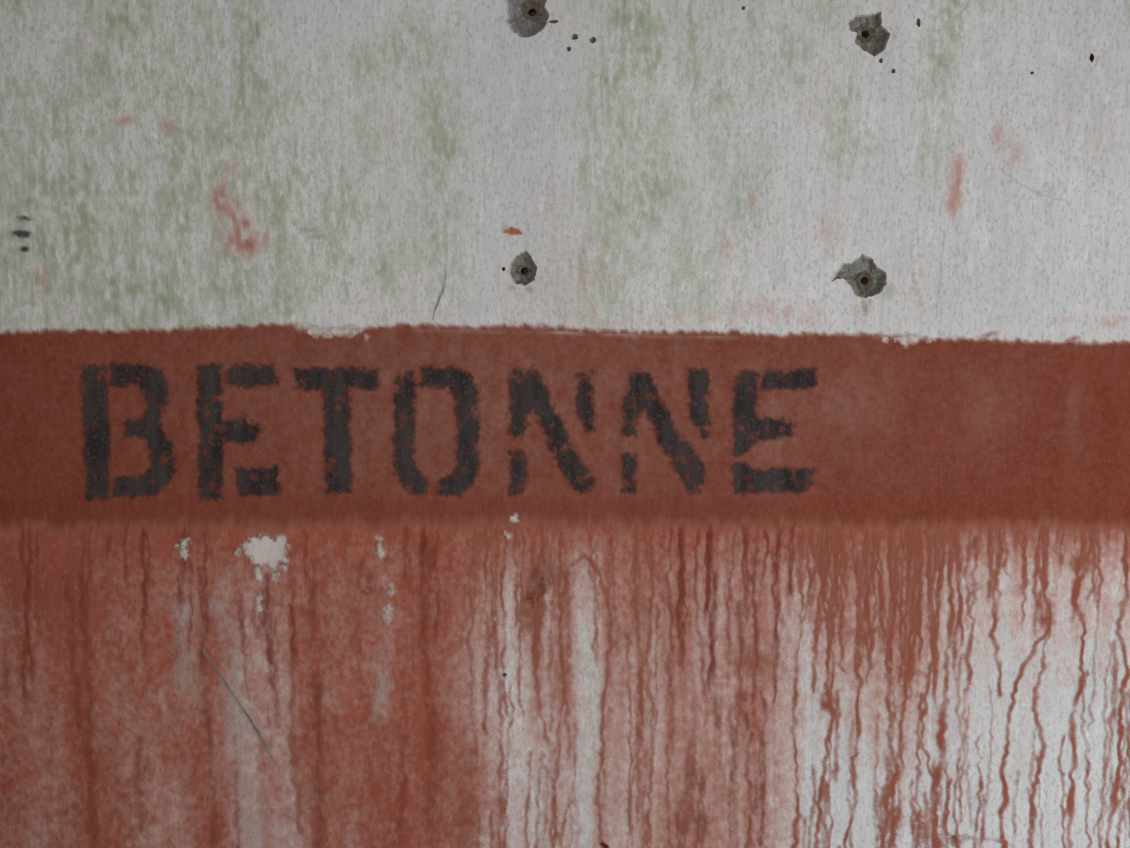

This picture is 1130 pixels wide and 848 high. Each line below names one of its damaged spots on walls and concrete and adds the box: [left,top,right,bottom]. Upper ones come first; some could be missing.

peeling [235,535,290,612]